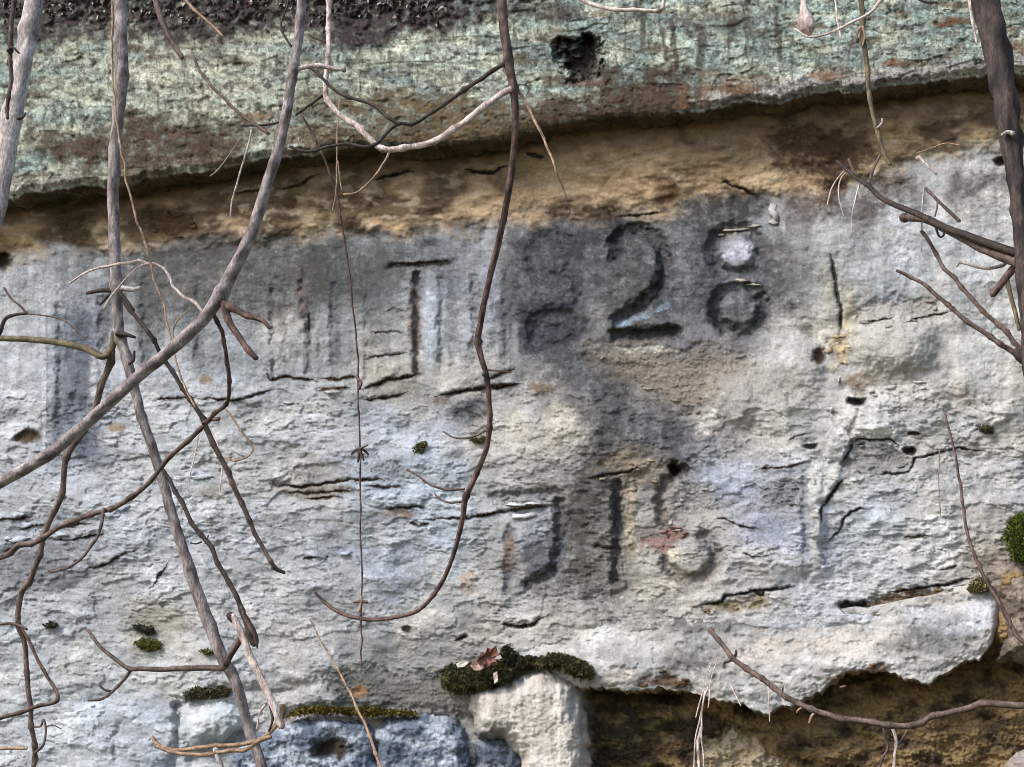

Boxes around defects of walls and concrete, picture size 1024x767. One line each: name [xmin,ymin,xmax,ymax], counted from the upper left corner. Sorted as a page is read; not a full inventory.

crack [820,431,984,543]
crack [696,584,799,607]